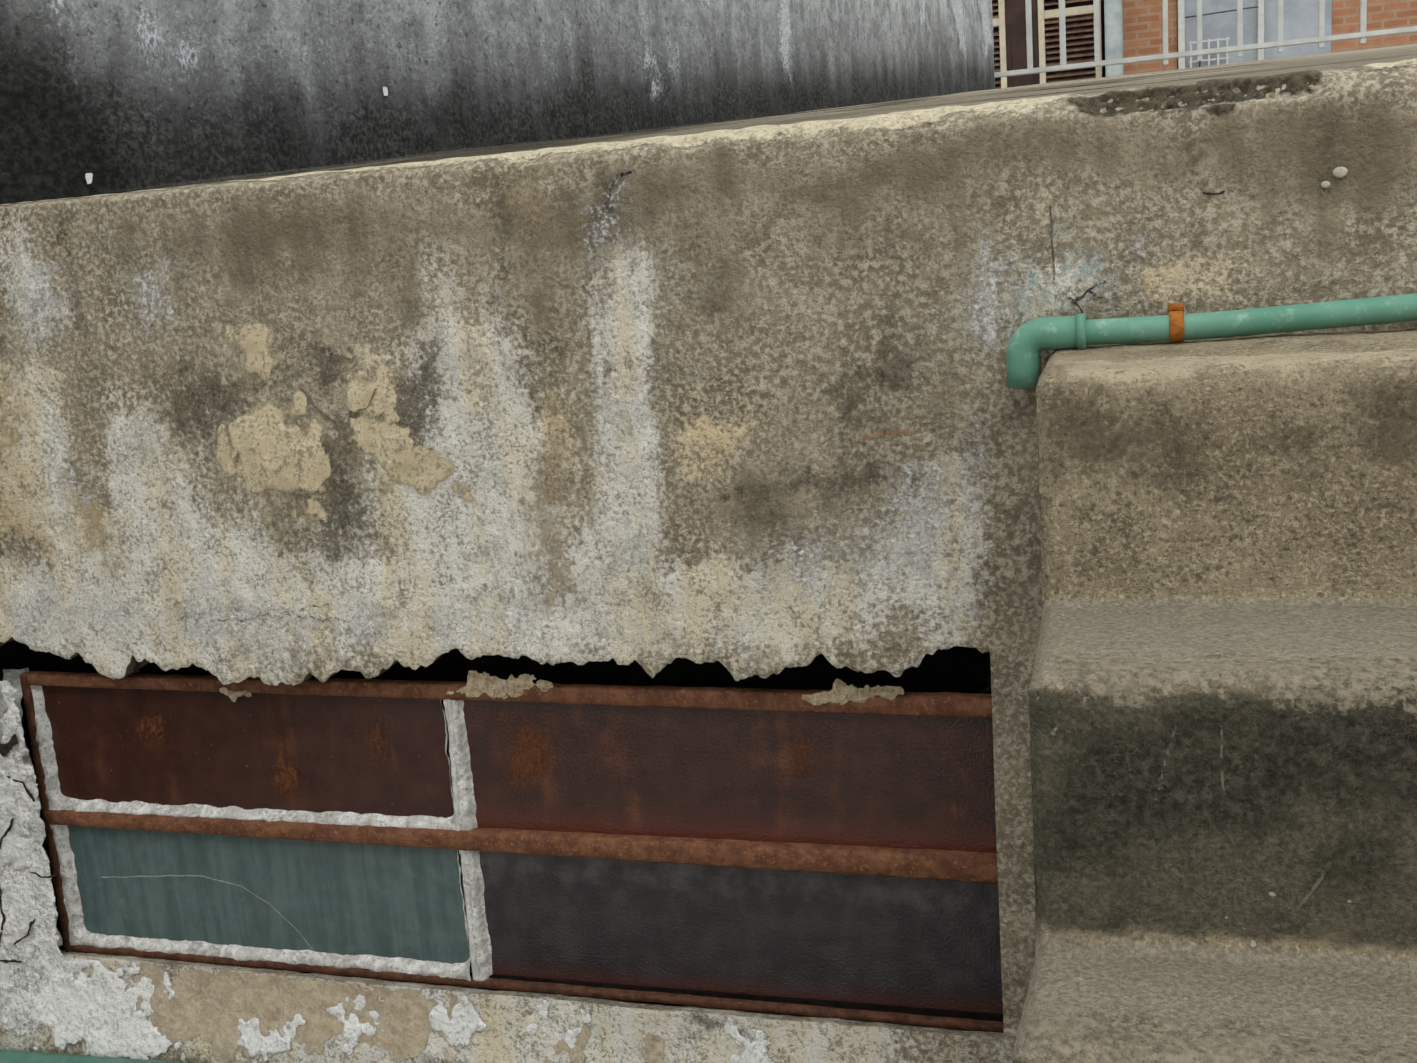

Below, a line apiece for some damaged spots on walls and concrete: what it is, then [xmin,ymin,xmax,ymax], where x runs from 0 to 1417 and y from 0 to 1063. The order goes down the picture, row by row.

spalling [1068,70,1322,116]
leakage [132,264,174,325]
leakage [374,332,457,450]
peeling [215,364,474,523]
leakage [250,410,384,571]
leakage [718,425,983,603]
spalling [131,661,252,702]
spalling [306,646,992,706]
crack [0,776,35,848]
crack [31,871,56,879]
peeling [0,668,486,1063]
crack [0,888,36,963]